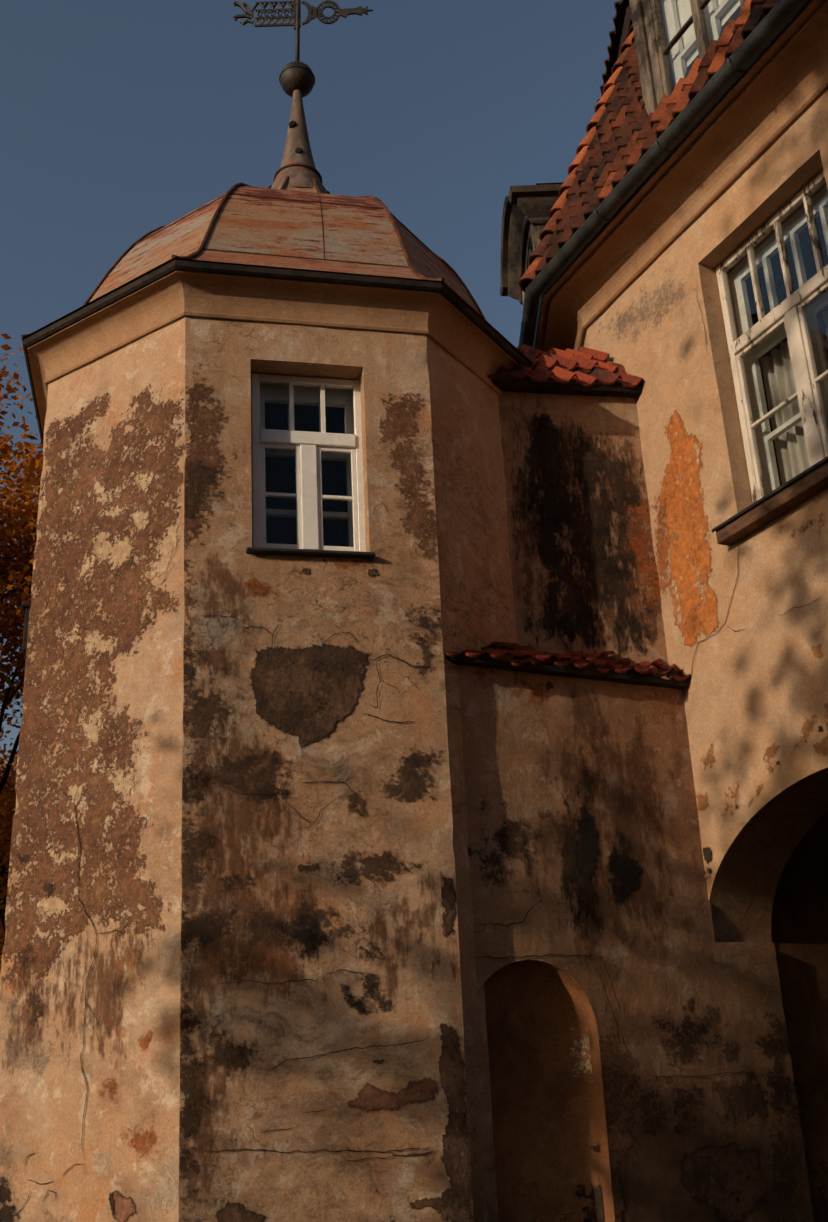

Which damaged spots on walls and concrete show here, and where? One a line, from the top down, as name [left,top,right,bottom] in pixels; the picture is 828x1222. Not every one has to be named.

peeling [1,364,238,988]
spalling [249,643,369,749]
peeling [379,388,437,562]
leakage [502,402,662,656]
peeling [621,410,720,647]
crack [690,548,744,678]
leakage [468,687,684,960]
crack [10,776,124,1220]
leakage [0,1177,20,1222]
spalling [109,1190,137,1222]
spalling [348,1023,473,1222]